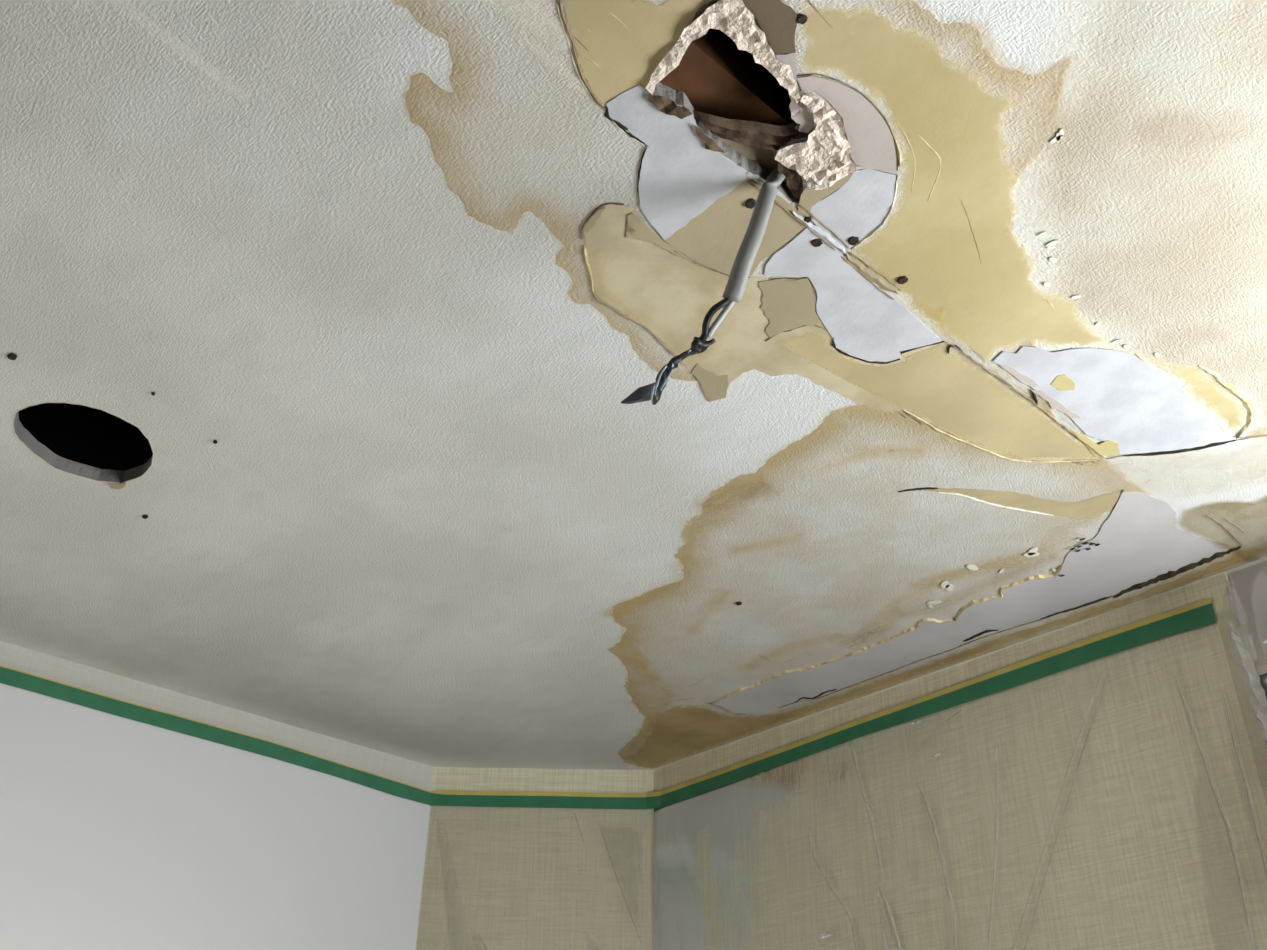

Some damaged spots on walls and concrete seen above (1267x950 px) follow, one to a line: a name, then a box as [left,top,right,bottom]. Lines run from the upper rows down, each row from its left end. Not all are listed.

leakage [396,0,701,381]
peeling [606,0,942,362]
leakage [749,0,1267,438]
peeling [993,339,1235,457]
leakage [609,404,1267,768]